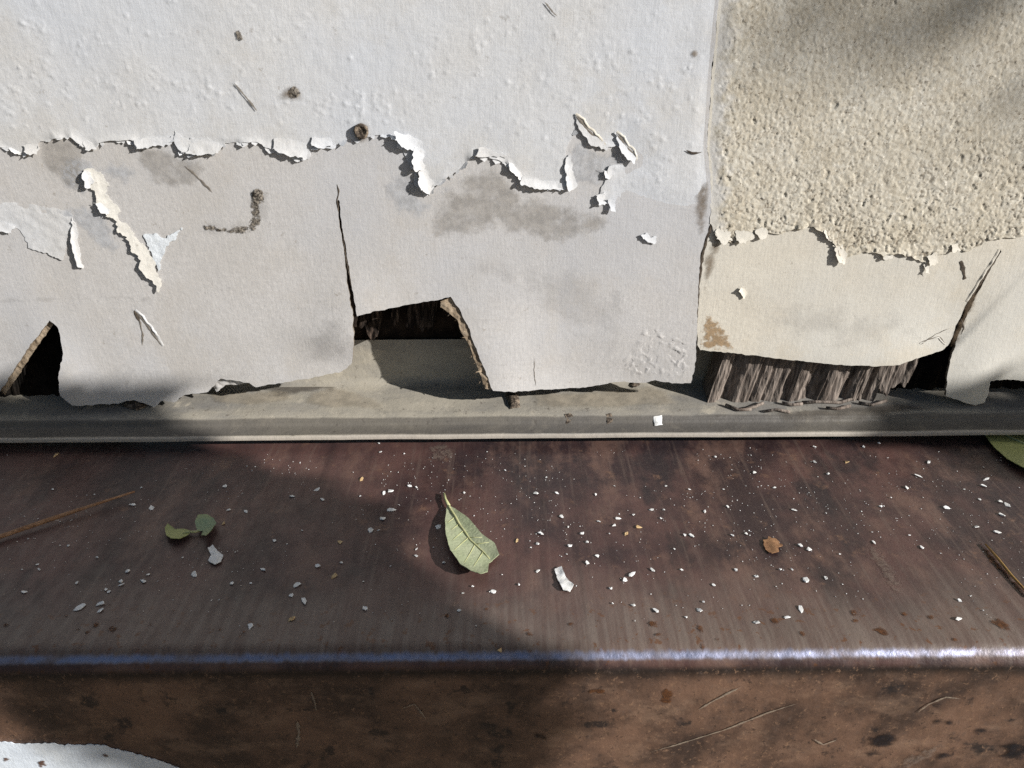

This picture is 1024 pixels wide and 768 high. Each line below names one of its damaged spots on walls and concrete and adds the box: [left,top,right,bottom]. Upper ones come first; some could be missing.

peeling [0,0,1024,293]
spalling [2,321,54,395]
crack [336,185,358,327]
spalling [441,297,492,389]
corrosion [704,319,730,348]
crack [920,249,1001,345]